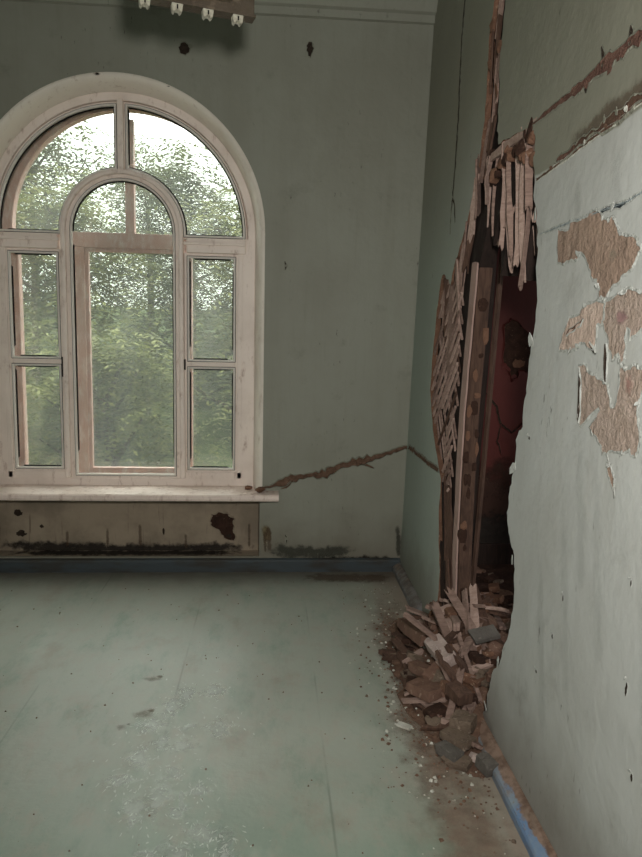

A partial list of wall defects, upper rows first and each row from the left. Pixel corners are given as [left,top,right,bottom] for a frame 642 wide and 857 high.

spalling [479,0,505,183]
peeling [536,91,642,183]
spalling [501,318,533,382]
peeling [556,201,642,499]
crack [262,445,438,490]
water stain [8,541,240,556]
spalling [209,511,236,541]
water stain [272,545,388,558]